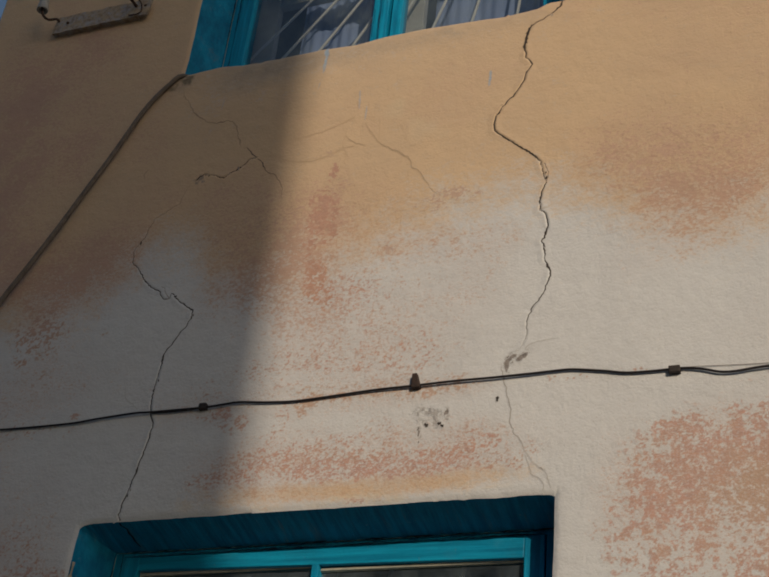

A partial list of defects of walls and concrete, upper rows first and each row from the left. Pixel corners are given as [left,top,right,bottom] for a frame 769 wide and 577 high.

crack [487,0,568,352]
crack [110,184,554,577]
peeling [164,369,553,505]
flaking render [501,338,560,374]
peeling [562,367,769,577]